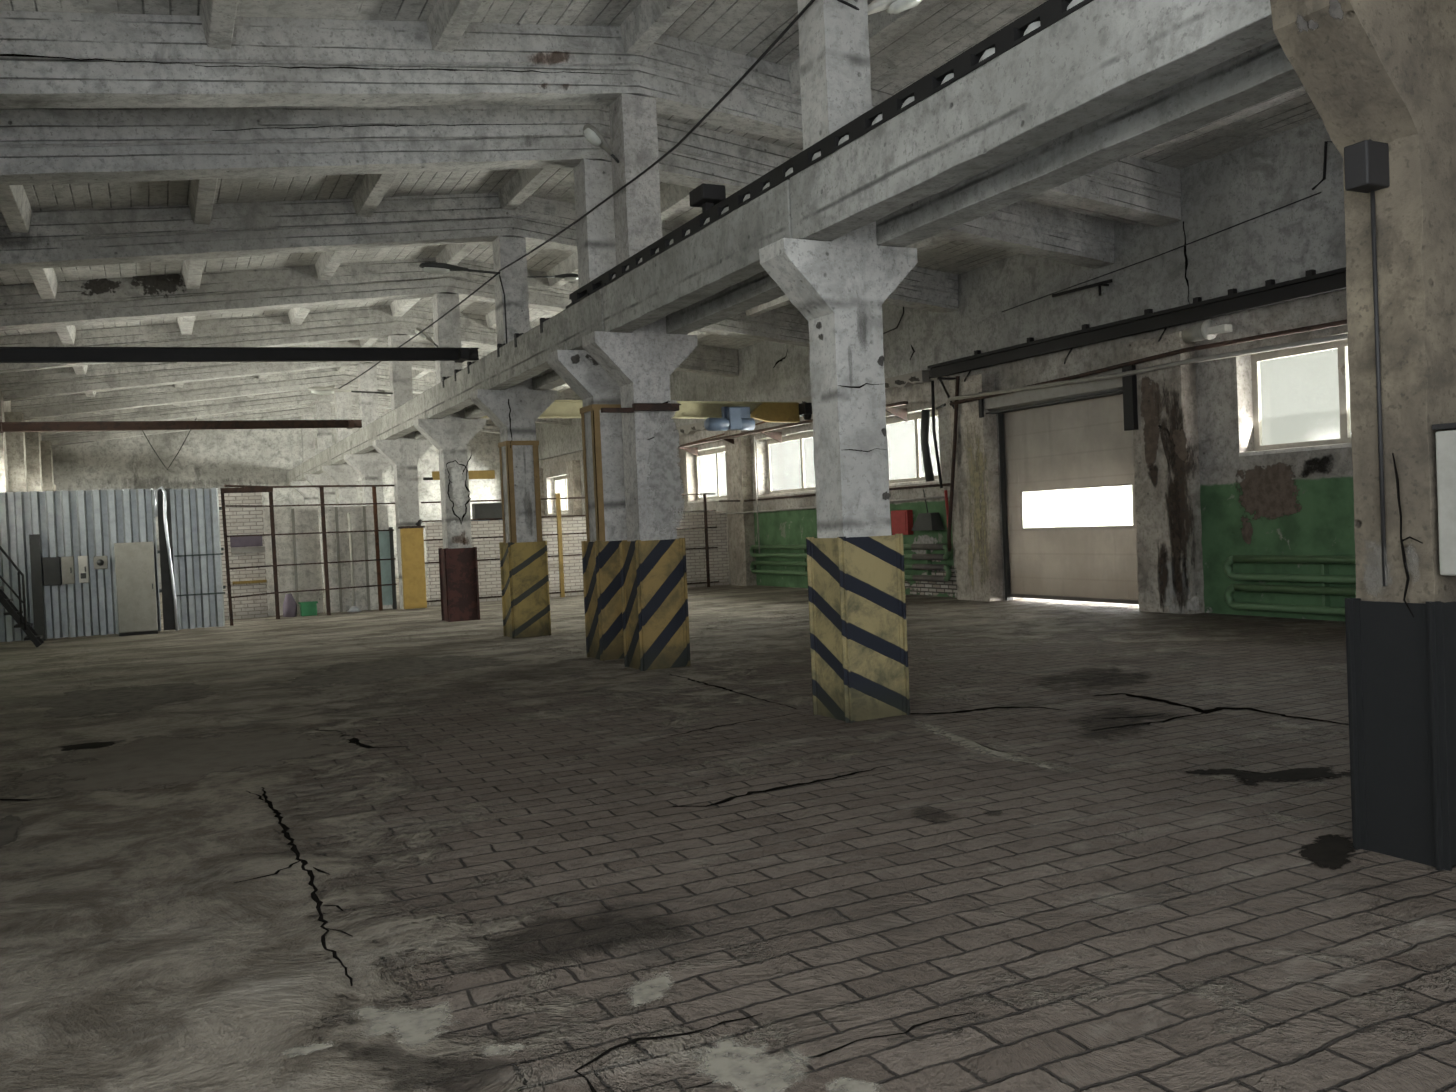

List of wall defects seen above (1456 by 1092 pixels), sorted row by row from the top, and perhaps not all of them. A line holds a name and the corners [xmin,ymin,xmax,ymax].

peeling [1140,377,1188,476]
peeling [1235,462,1302,544]
spalling [1157,556,1199,614]
crack [910,706,1060,714]
crack [1091,693,1349,731]
crack [673,766,884,807]
crack [234,787,353,986]